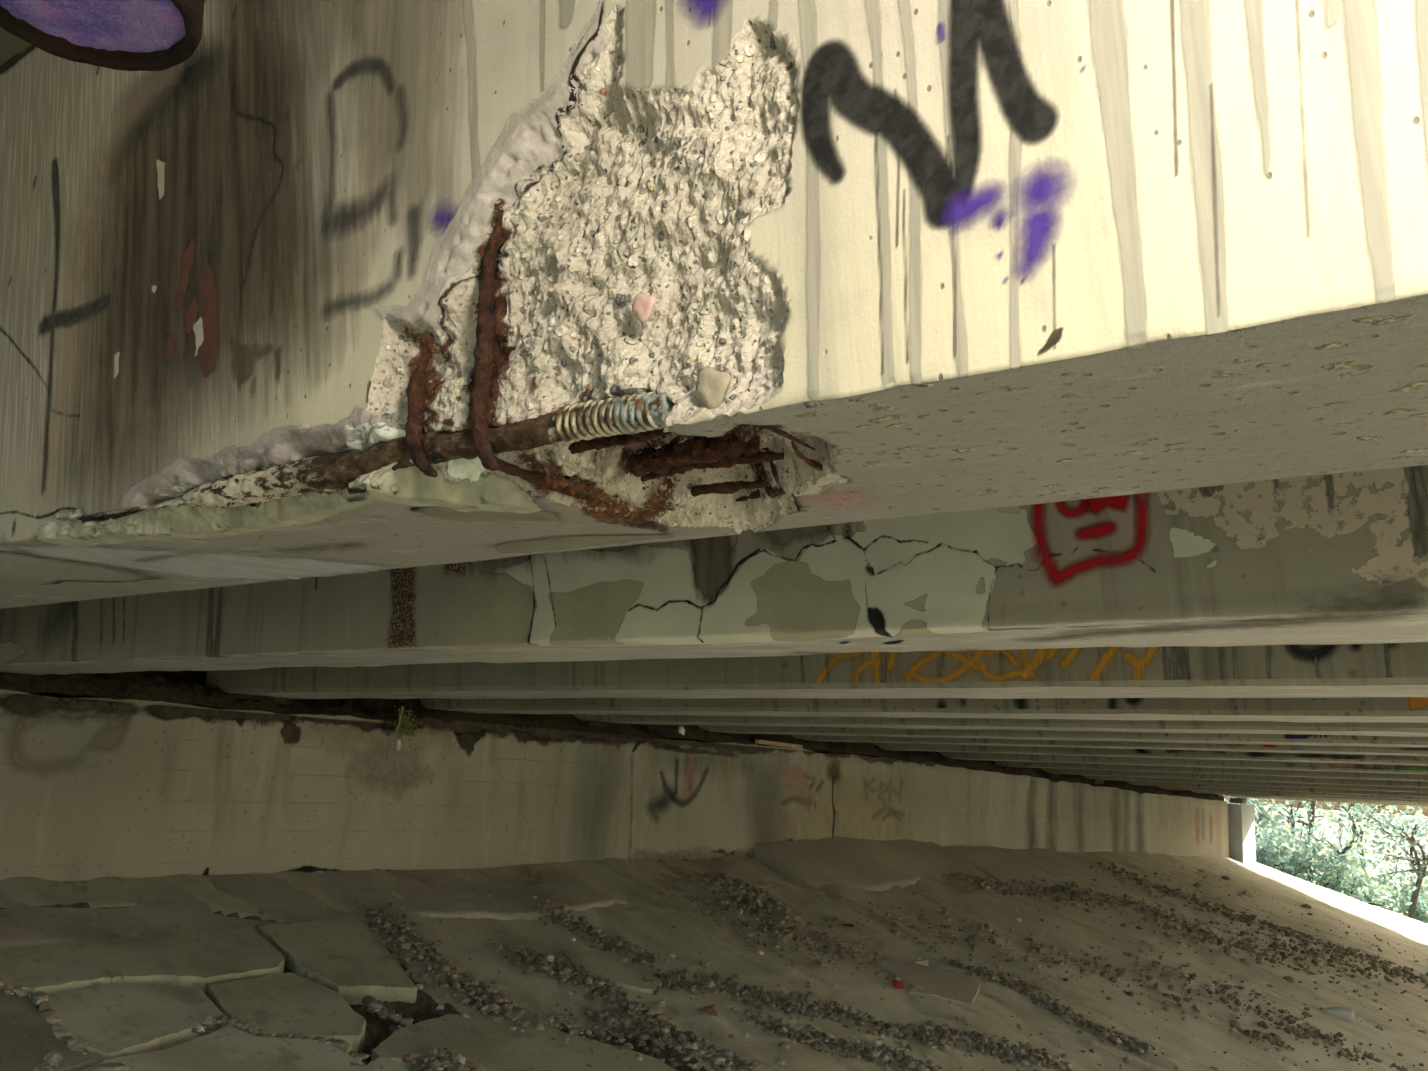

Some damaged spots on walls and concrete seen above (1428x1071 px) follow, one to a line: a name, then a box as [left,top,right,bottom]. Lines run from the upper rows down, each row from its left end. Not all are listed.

crack [498,1,603,214]
spalling [38,0,853,548]
corrosion [404,199,520,433]
crack [438,252,509,331]
water stain [339,422,406,452]
water stain [447,457,487,484]
corrosion [519,433,700,534]
corrosion [725,424,823,512]
peeling [1157,467,1428,588]
corrosion [388,567,416,648]
crack [527,555,556,645]
crack [629,523,1156,643]